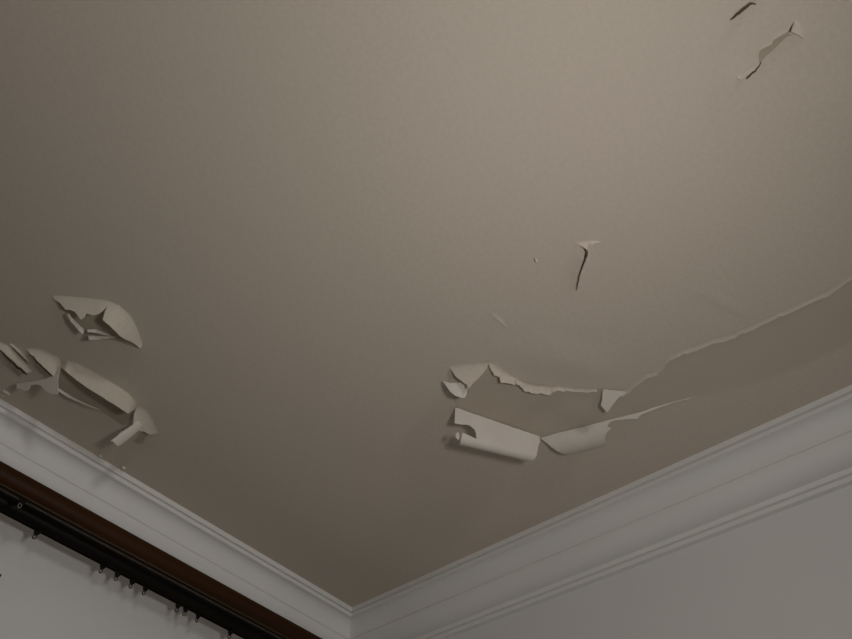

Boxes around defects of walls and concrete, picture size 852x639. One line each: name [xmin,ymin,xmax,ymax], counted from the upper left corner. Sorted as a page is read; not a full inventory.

peeling [53,295,142,348]
peeling [0,342,159,446]
peeling [443,351,696,462]